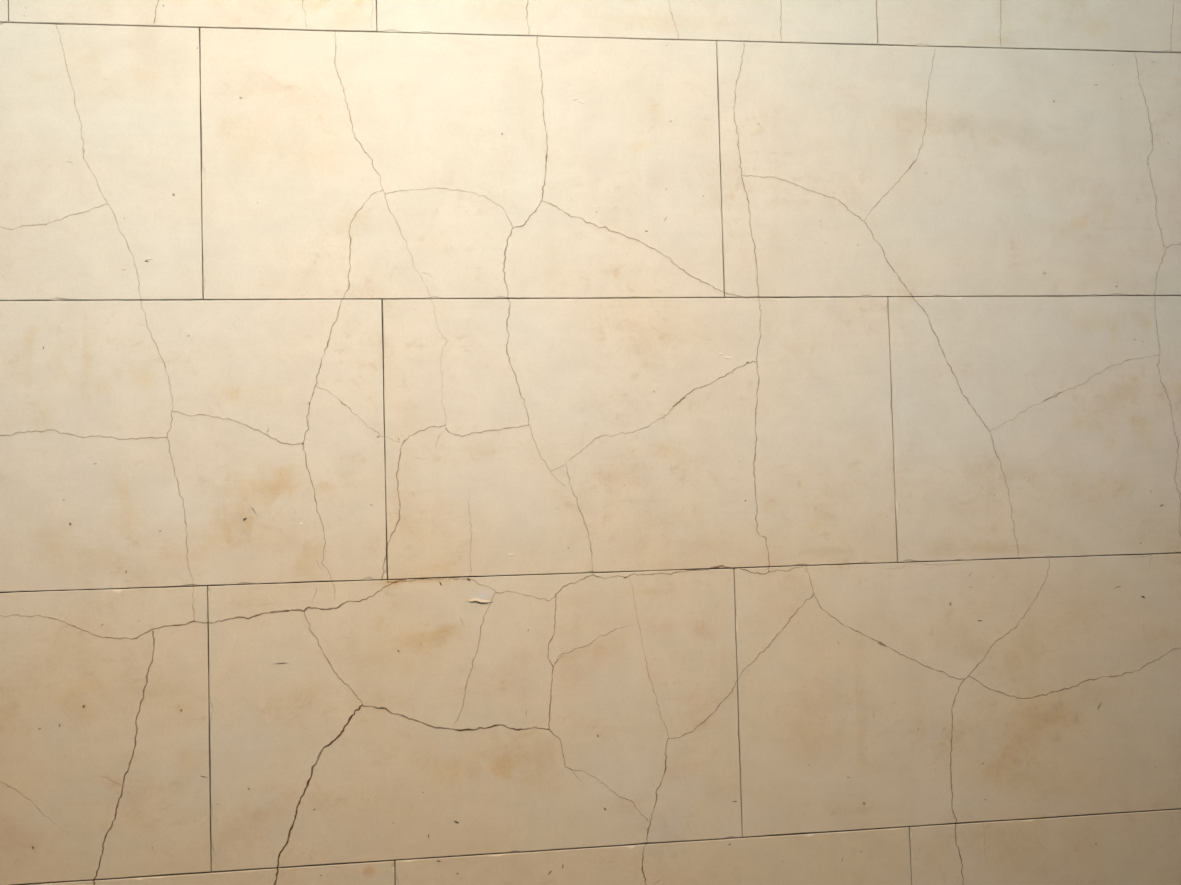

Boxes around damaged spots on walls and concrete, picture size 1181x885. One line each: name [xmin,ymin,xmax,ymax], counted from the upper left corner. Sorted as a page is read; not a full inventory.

crack [93,557,406,885]
crack [274,700,551,885]